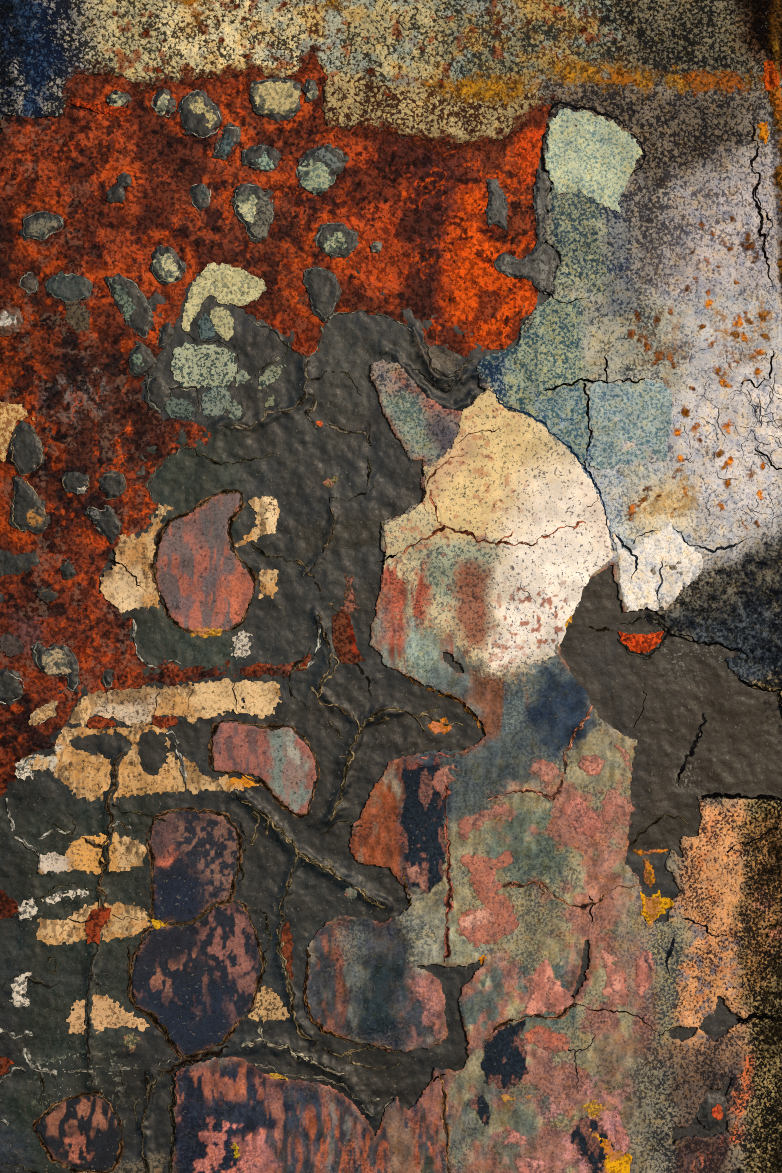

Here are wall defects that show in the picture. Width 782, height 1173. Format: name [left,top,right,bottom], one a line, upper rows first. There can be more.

rust [757,0,782,222]
crack [750,119,776,297]
rust [0,29,556,796]
crack [377,348,782,728]
rust [675,407,703,443]
rust [716,449,734,488]
rust [714,311,770,388]
crack [32,310,485,1173]
peeling [0,262,782,1173]
crack [628,713,782,853]
crack [665,918,727,975]
crack [483,1002,682,1087]